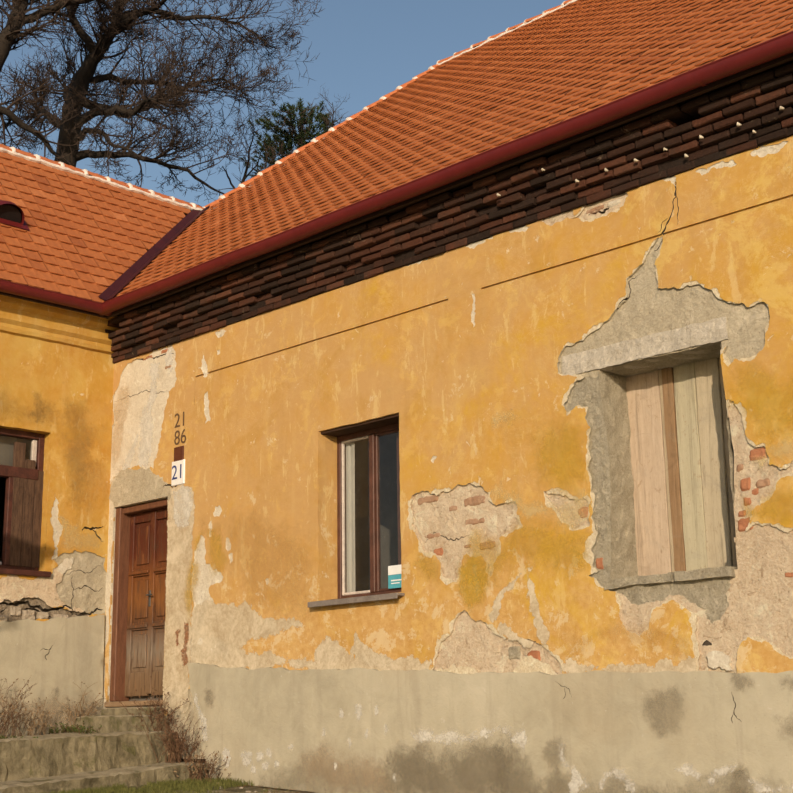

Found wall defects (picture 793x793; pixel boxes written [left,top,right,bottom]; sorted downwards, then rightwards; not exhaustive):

crack [655,181,679,251]
flaking render [110,345,177,484]
flaking render [163,192,793,759]
crack [82,526,103,542]
crack [0,565,103,618]
flaking render [0,497,115,709]
water stain [413,727,527,748]
water stain [560,748,587,793]